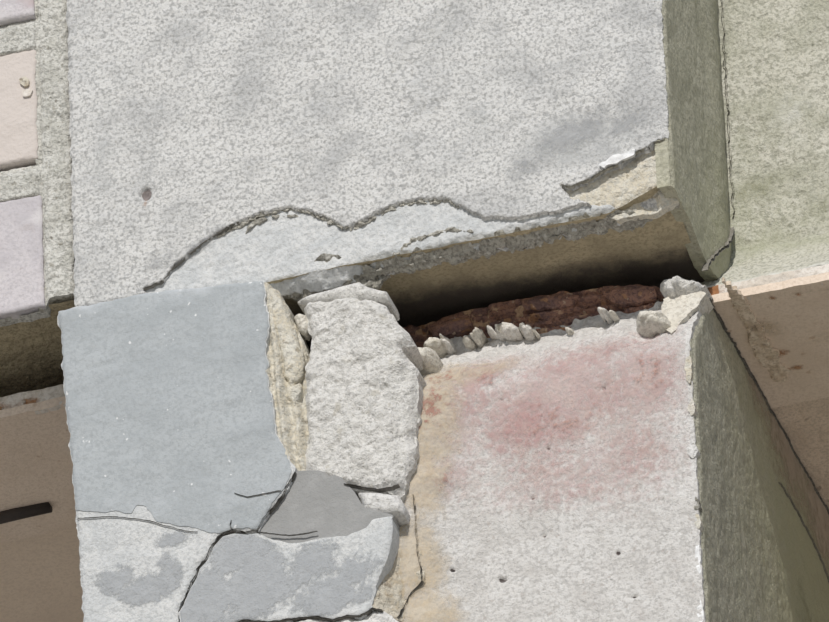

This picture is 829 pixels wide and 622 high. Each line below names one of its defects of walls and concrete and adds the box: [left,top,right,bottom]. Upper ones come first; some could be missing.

crack [702,2,735,271]
corrosion [427,316,475,339]
corrosion [521,291,580,314]
corrosion [603,285,660,309]
peeling [58,139,679,622]
crack [77,472,318,612]
crack [778,482,829,583]
crack [238,607,383,622]